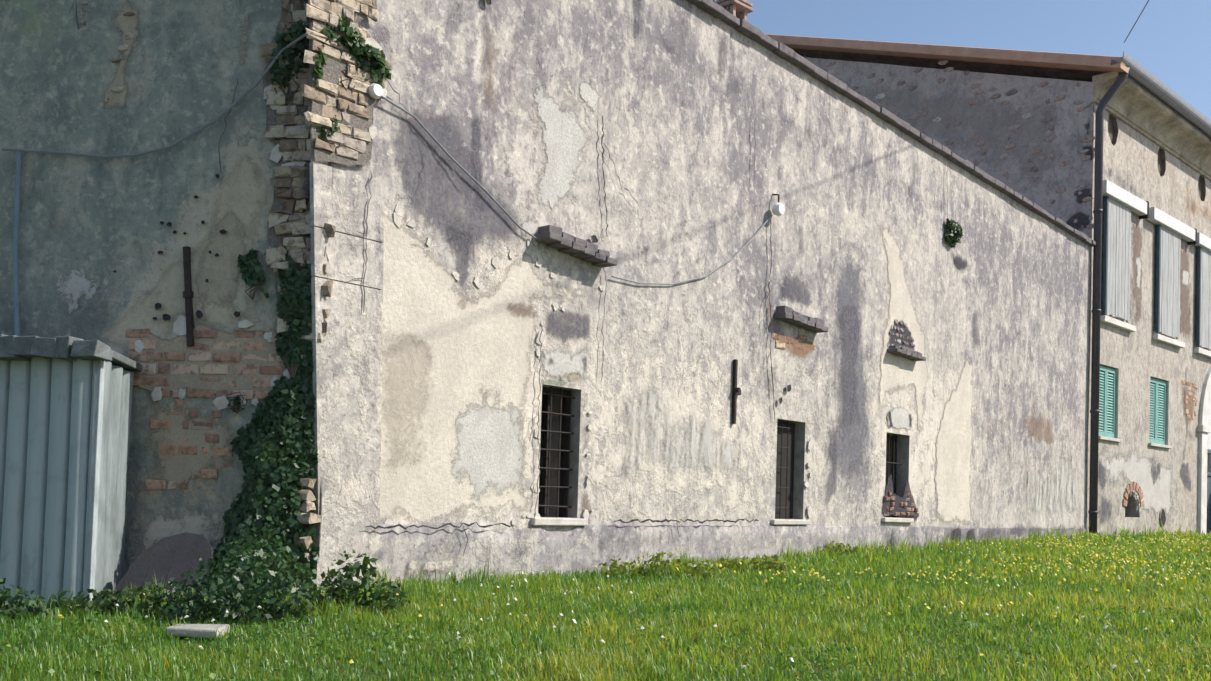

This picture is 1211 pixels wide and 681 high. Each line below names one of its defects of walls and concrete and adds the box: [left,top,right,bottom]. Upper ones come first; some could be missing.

flaking render [56,267,112,314]
flaking render [101,0,393,490]
water stain [396,111,518,285]
flaking render [348,204,605,527]
flaking render [533,82,600,210]
flaking render [773,333,816,358]
water stain [827,269,868,499]
flaking render [883,473,919,520]
flaking render [879,226,928,431]
flaking render [935,360,973,523]